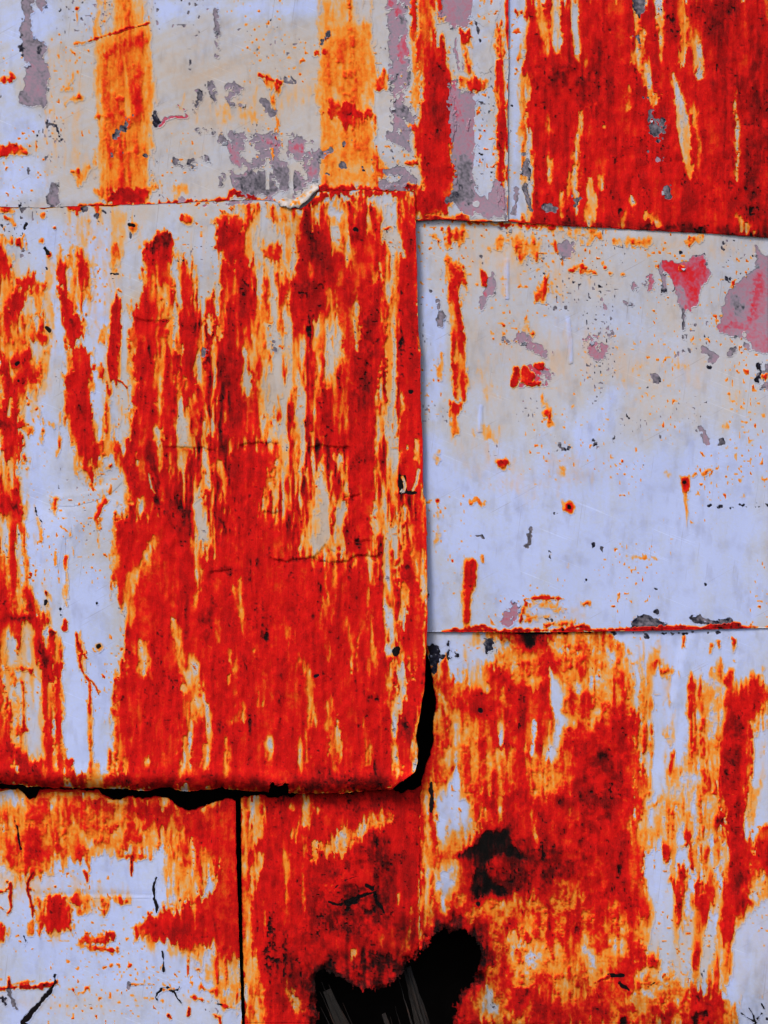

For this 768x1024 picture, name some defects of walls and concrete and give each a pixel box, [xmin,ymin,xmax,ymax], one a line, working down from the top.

peeling [18,0,51,109]
peeling [192,81,246,113]
peeling [195,128,325,209]
peeling [379,165,418,191]
peeling [385,0,418,153]
peeling [438,0,512,234]
corrosion [488,0,768,265]
peeling [624,253,713,340]
peeling [717,245,768,390]
corrosion [0,0,490,793]
corrosion [241,557,767,1023]
corrosion [1,789,240,1023]